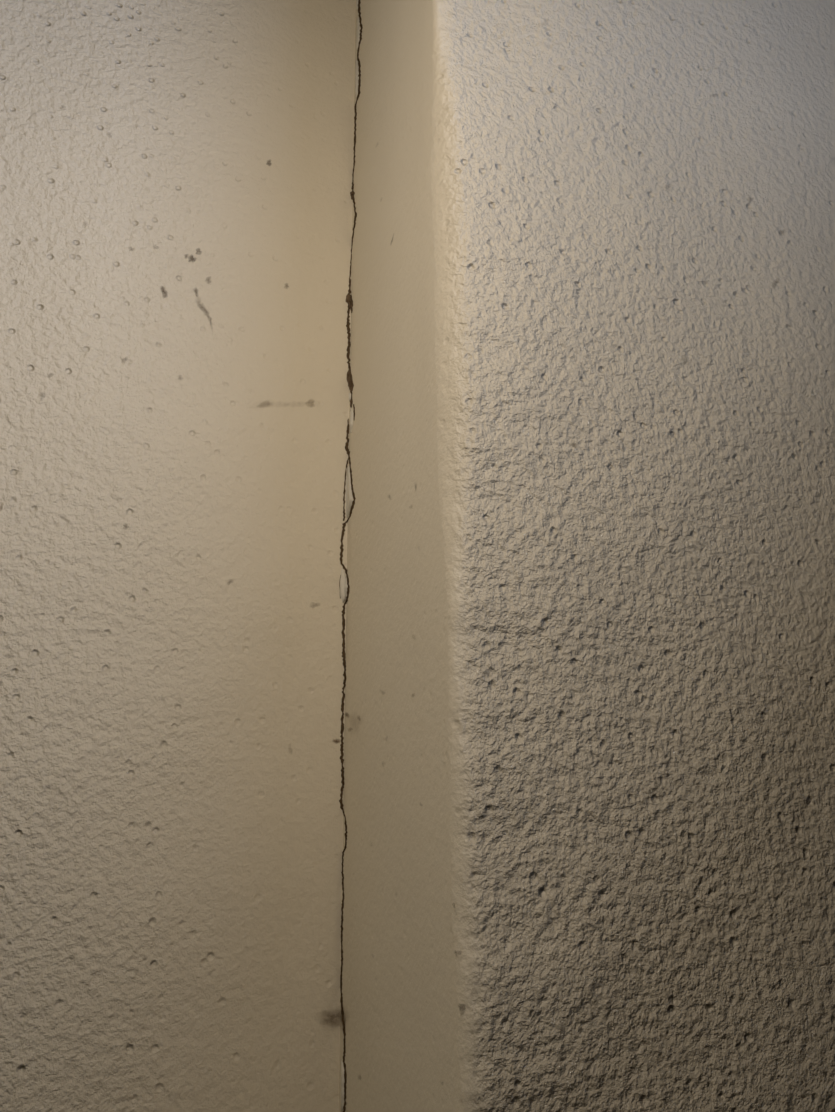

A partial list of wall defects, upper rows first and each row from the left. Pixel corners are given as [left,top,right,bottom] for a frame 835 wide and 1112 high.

crack [334,0,363,1112]